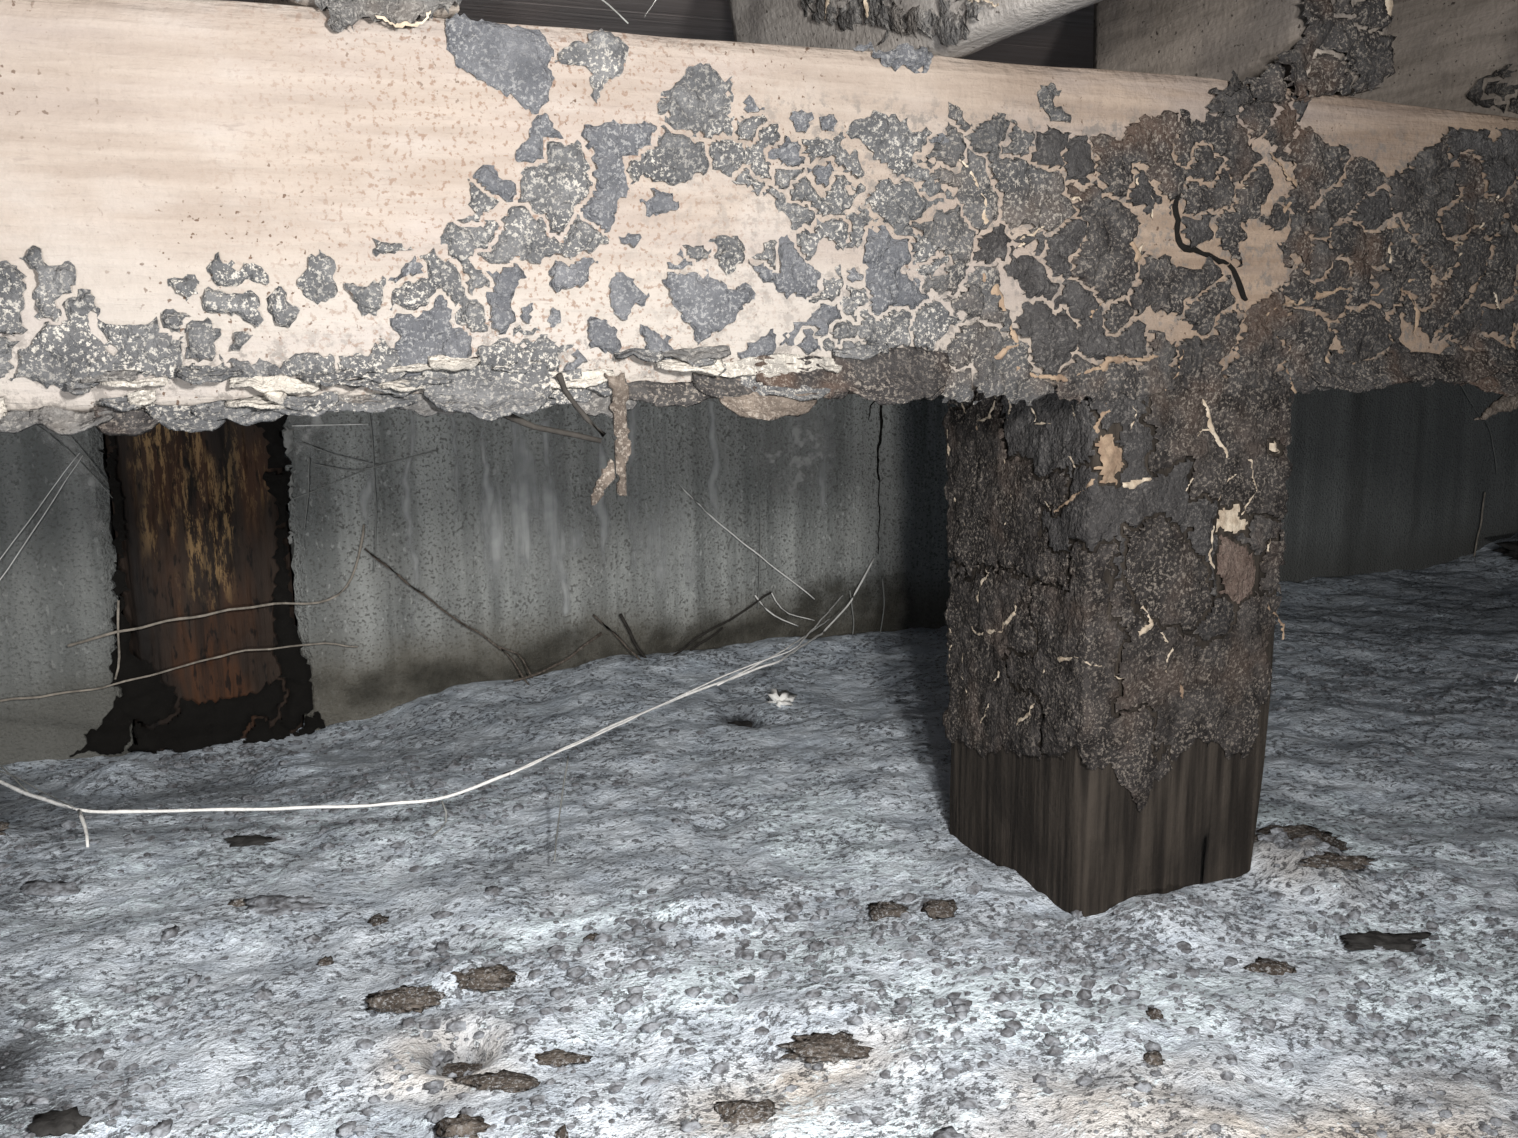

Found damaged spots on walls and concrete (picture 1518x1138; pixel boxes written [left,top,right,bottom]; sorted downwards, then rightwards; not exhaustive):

peeling [0,0,1518,812]